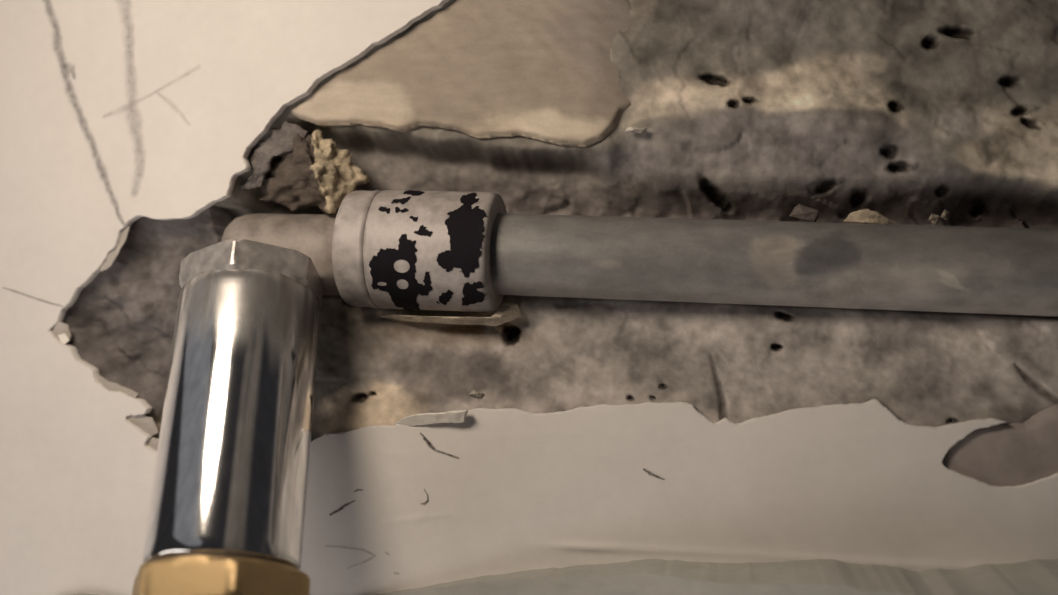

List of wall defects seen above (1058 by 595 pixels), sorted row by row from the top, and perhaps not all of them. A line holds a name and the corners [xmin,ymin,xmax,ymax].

flaking render [53,0,1058,487]